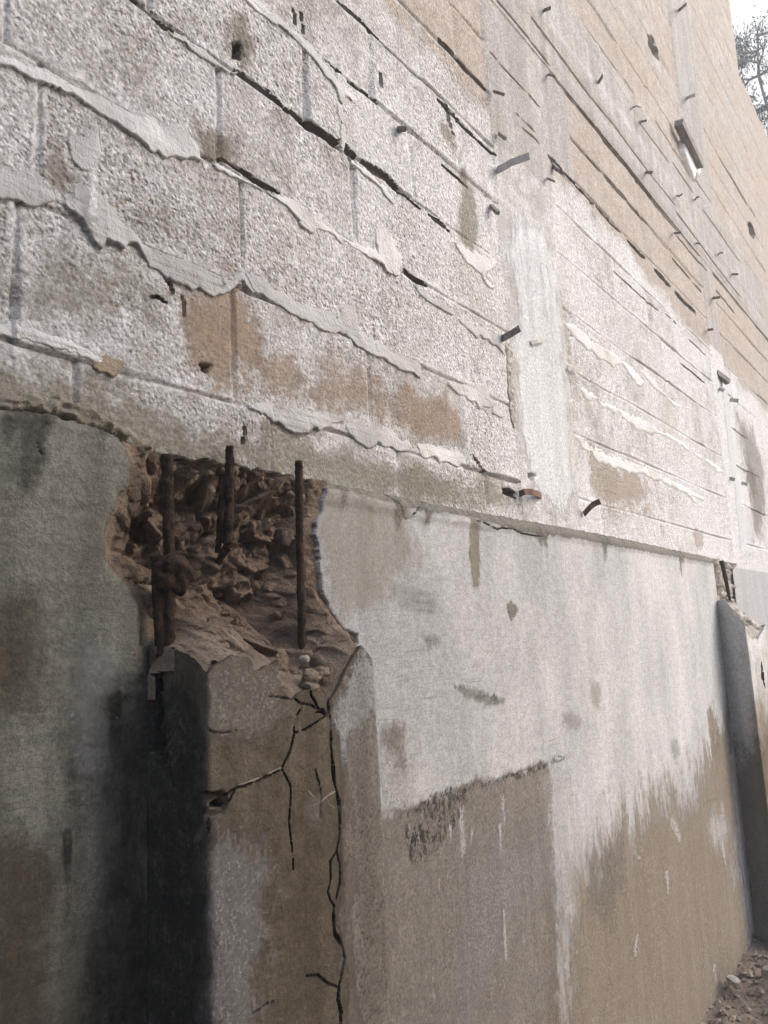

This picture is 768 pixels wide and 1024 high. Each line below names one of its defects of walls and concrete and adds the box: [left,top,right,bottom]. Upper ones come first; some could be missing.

spalling [0,392,358,715]
peeling [182,288,302,393]
peeling [590,459,648,513]
spalling [693,529,762,639]
water stain [64,829,72,866]
water stain [82,647,285,1024]
crack [218,691,346,1023]
water stain [382,701,768,1024]